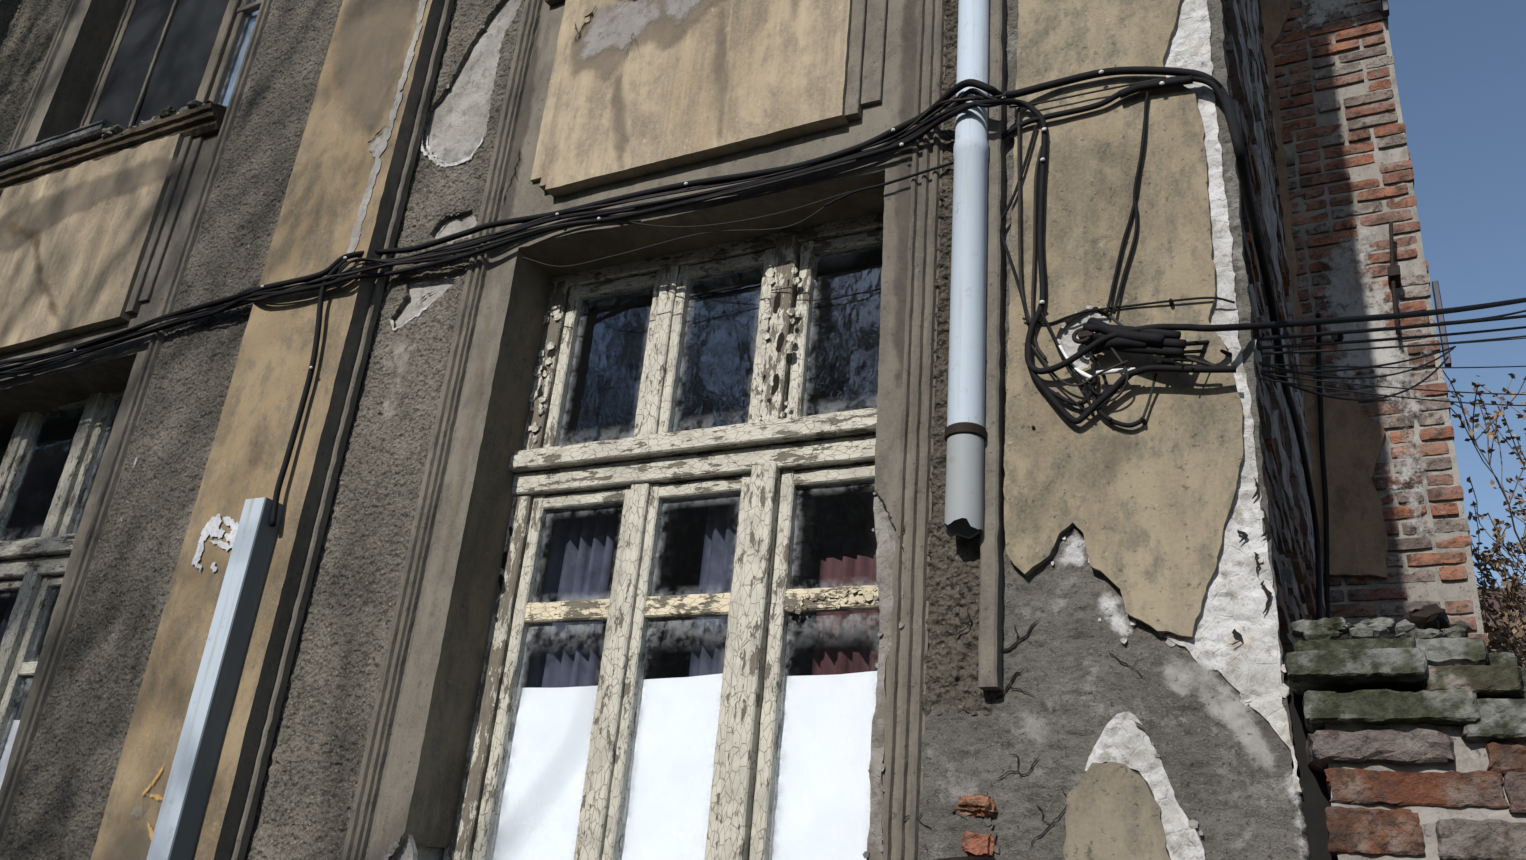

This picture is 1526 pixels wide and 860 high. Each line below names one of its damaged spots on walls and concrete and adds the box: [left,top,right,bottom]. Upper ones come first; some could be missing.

peeling [582,0,699,58]
spalling [420,0,521,168]
spalling [347,0,427,253]
peeling [543,306,562,324]
peeling [527,342,556,443]
spalling [1158,0,1304,853]
peeling [498,526,513,594]
spalling [1051,534,1089,566]
spalling [1098,593,1137,644]
spalling [1085,711,1206,860]
spalling [380,834,418,860]
spalling [951,788,1000,857]